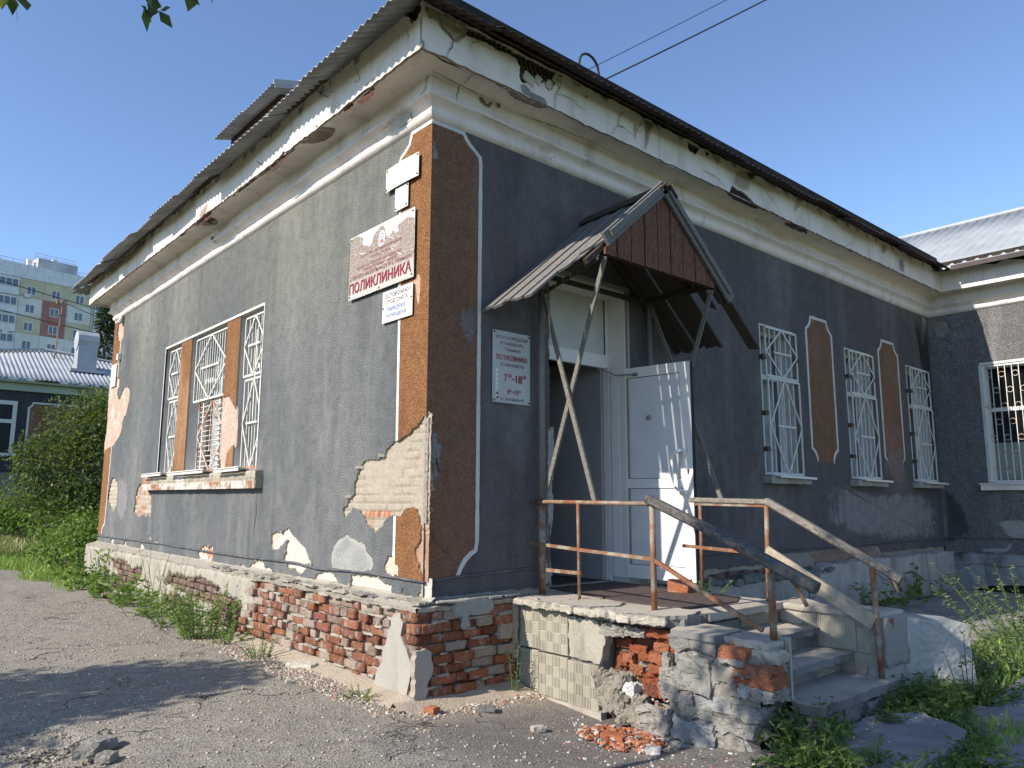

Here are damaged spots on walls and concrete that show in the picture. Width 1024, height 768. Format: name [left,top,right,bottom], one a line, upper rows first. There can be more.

crack [407,14,662,155]
flaking render [301,125,335,144]
peeling [104,377,130,452]
flaking render [109,478,118,512]
flaking render [135,484,151,517]
flaking render [165,412,668,630]
water stain [830,487,938,539]
flaking render [108,559,143,589]